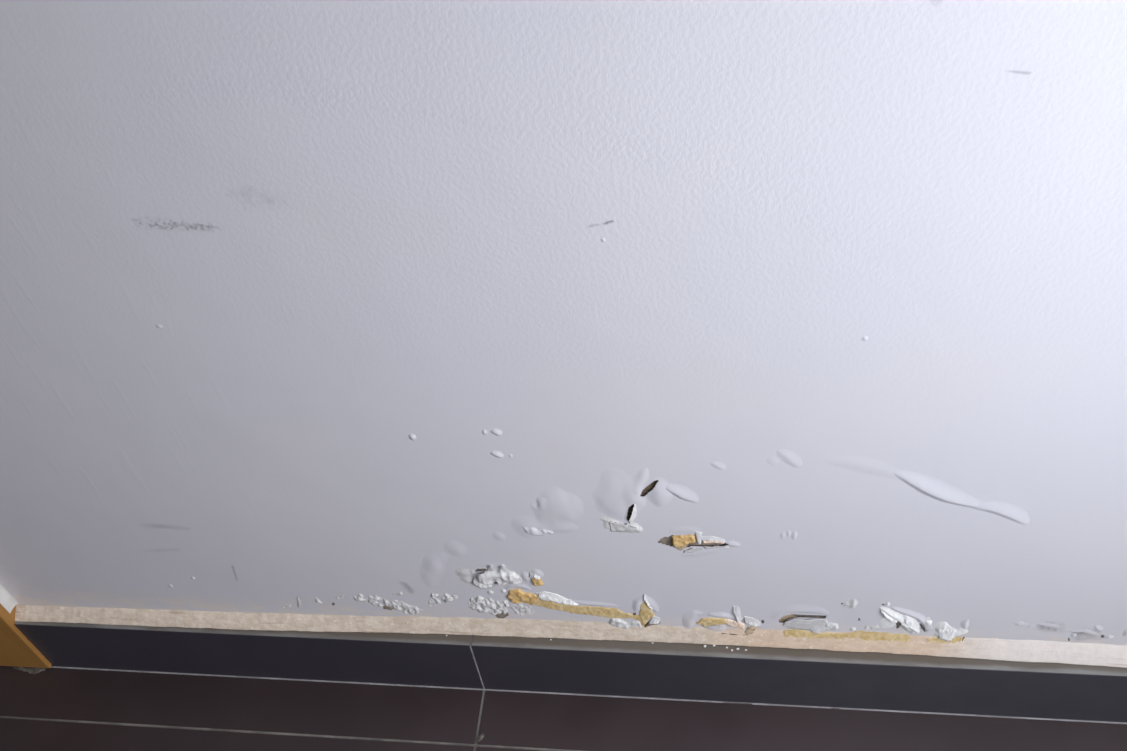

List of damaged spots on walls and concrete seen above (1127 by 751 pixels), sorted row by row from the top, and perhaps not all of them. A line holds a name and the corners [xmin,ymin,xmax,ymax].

flaking render [658,526,741,557]
flaking render [15,564,1127,668]